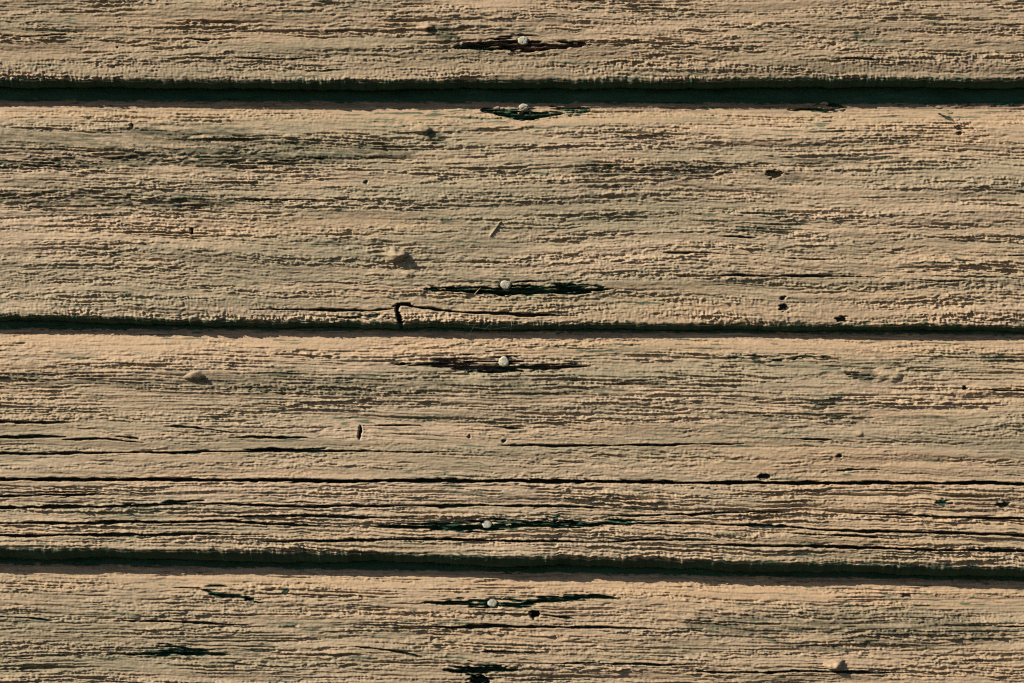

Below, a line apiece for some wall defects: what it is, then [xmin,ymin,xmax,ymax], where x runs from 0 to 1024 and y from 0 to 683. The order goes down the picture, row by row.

crack [255,303,568,324]
crack [0,420,461,455]
crack [499,427,744,448]
crack [837,466,880,474]
crack [0,493,1024,553]